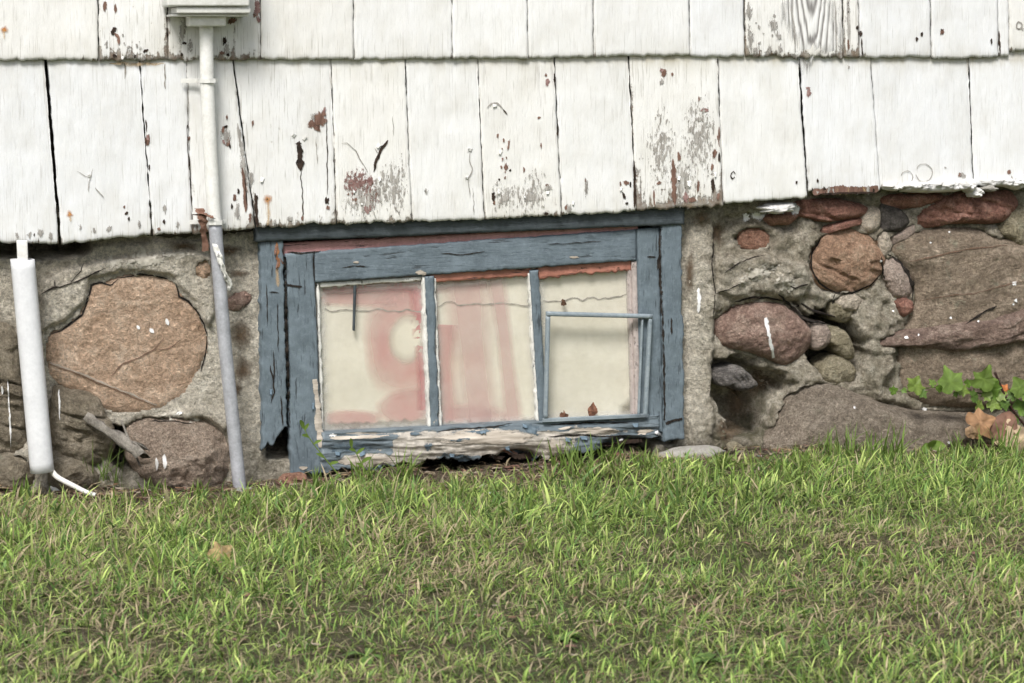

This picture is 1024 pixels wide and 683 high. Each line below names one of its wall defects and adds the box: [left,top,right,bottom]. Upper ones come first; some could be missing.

peeling [746,2,783,55]
peeling [307,107,408,218]
peeling [492,134,553,215]
peeling [646,94,720,208]
peeling [410,421,661,461]